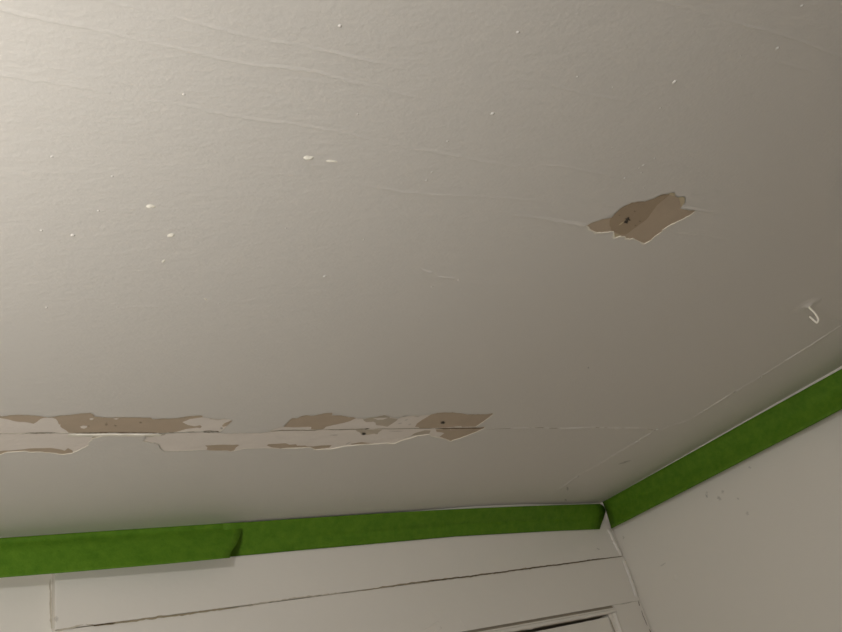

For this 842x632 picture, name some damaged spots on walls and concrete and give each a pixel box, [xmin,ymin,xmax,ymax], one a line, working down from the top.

peeling [586,193,695,245]
peeling [0,412,493,455]